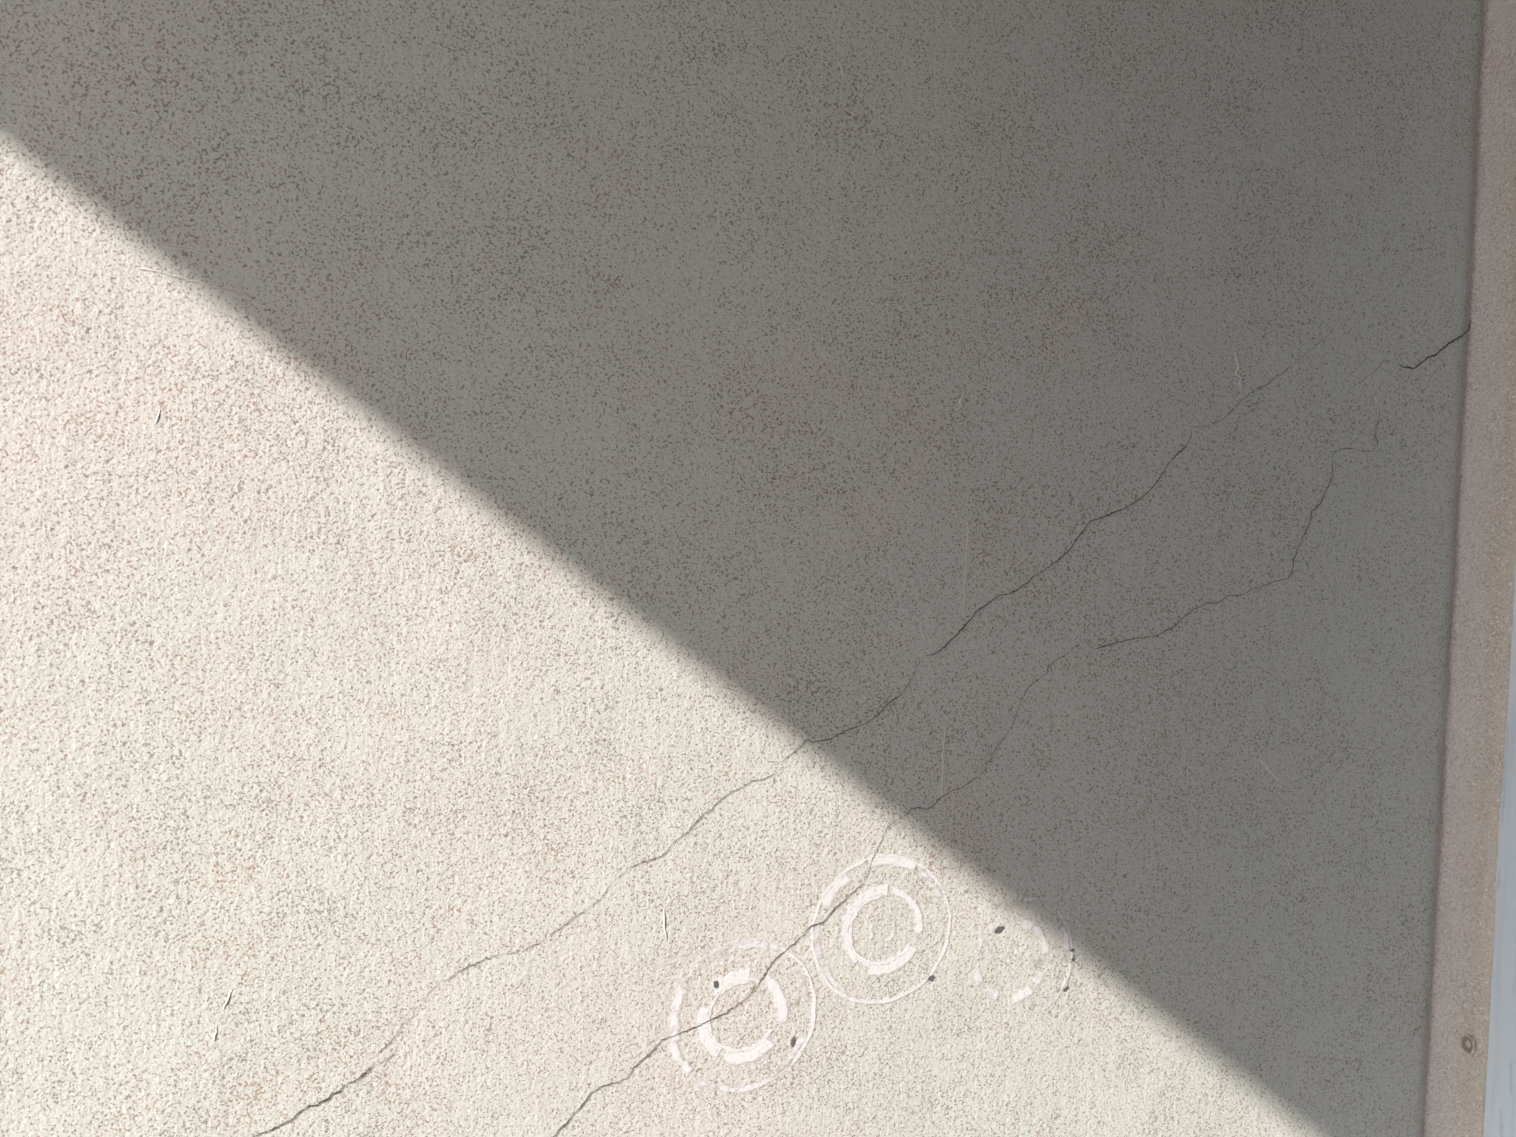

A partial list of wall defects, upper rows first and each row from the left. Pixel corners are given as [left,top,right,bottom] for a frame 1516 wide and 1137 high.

crack [253,319,1472,1137]